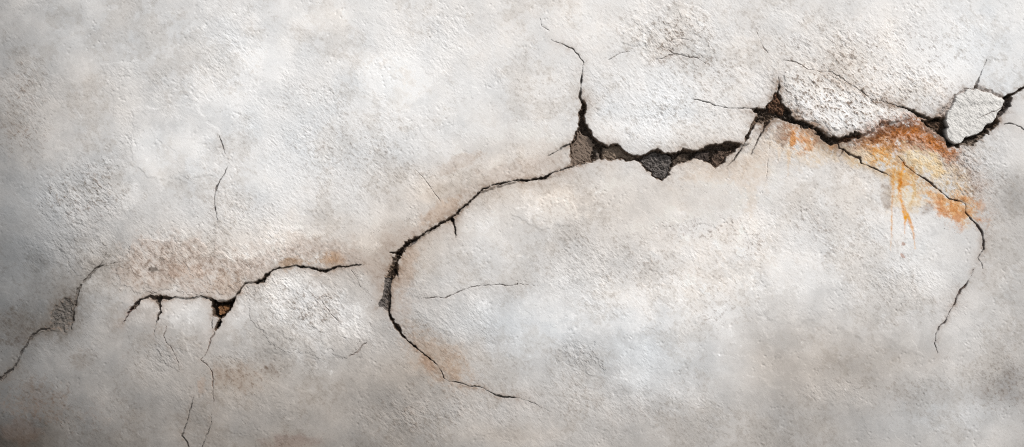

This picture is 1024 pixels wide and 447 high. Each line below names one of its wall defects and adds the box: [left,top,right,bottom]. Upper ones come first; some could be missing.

crack [378,38,1024,404]
rust [773,108,1004,259]
crack [0,256,118,382]
crack [122,264,364,447]